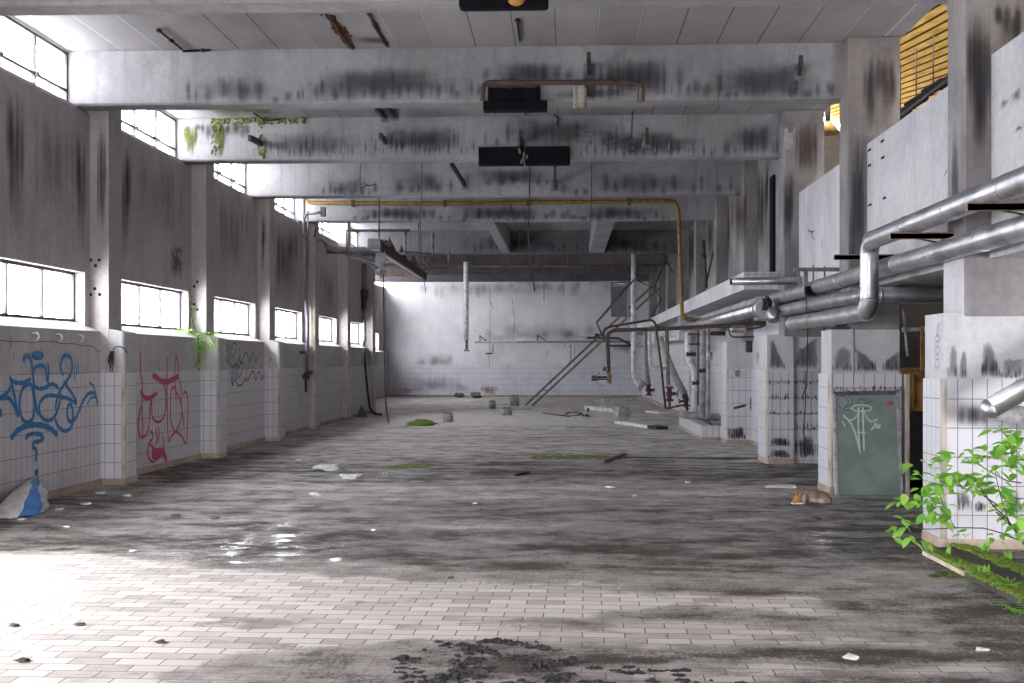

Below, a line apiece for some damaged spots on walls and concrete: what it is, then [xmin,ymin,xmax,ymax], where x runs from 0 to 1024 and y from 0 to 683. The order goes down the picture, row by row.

spalling [320,14,355,50]
spalling [366,13,389,48]
water stain [995,8,1021,39]
water stain [346,73,425,92]
water stain [587,66,656,97]
water stain [968,41,990,119]
water stain [411,132,441,146]
water stain [494,172,529,181]
water stain [840,352,873,369]
water stain [886,355,897,369]
water stain [983,349,1020,377]
water stain [768,344,818,458]